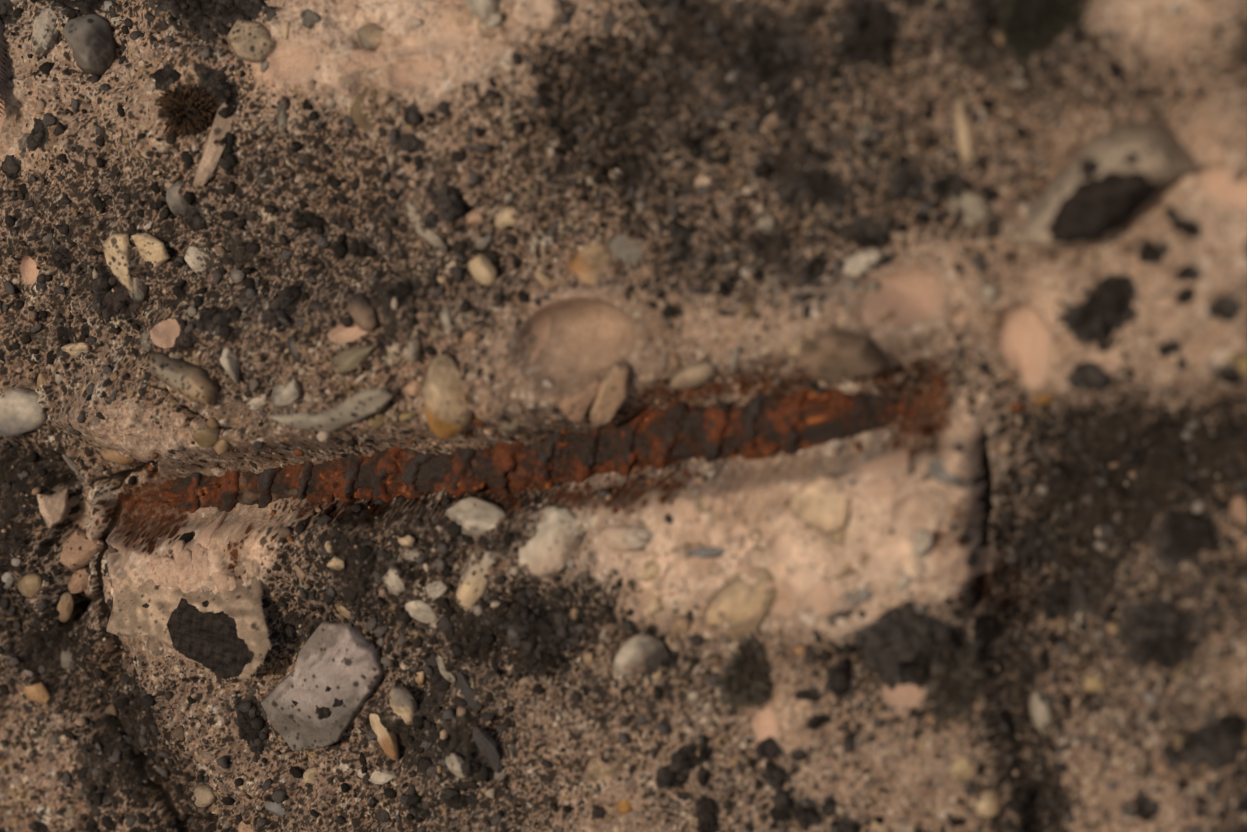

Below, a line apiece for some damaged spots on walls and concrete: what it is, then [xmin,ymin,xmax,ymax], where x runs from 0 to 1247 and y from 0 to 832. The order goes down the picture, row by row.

spalling [531,292,682,411]
rust [606,360,950,466]
rust [286,465,701,532]
spalling [103,388,917,630]
spalling [568,433,1003,644]